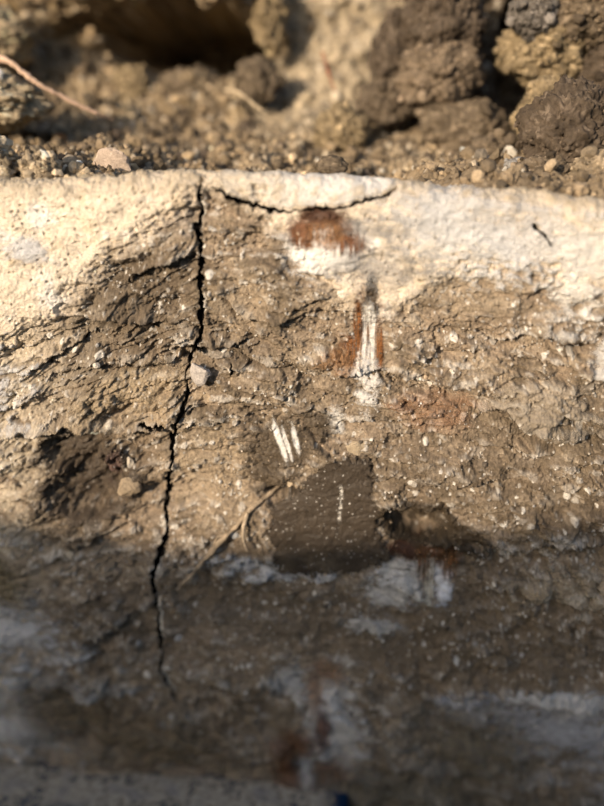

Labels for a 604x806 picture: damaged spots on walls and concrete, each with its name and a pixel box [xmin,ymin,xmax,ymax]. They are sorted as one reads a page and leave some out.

corrosion [276,205,370,280]
corrosion [340,276,383,372]
leakage [392,192,604,329]
crack [138,186,387,703]
leakage [208,408,492,585]
corrosion [388,540,460,580]